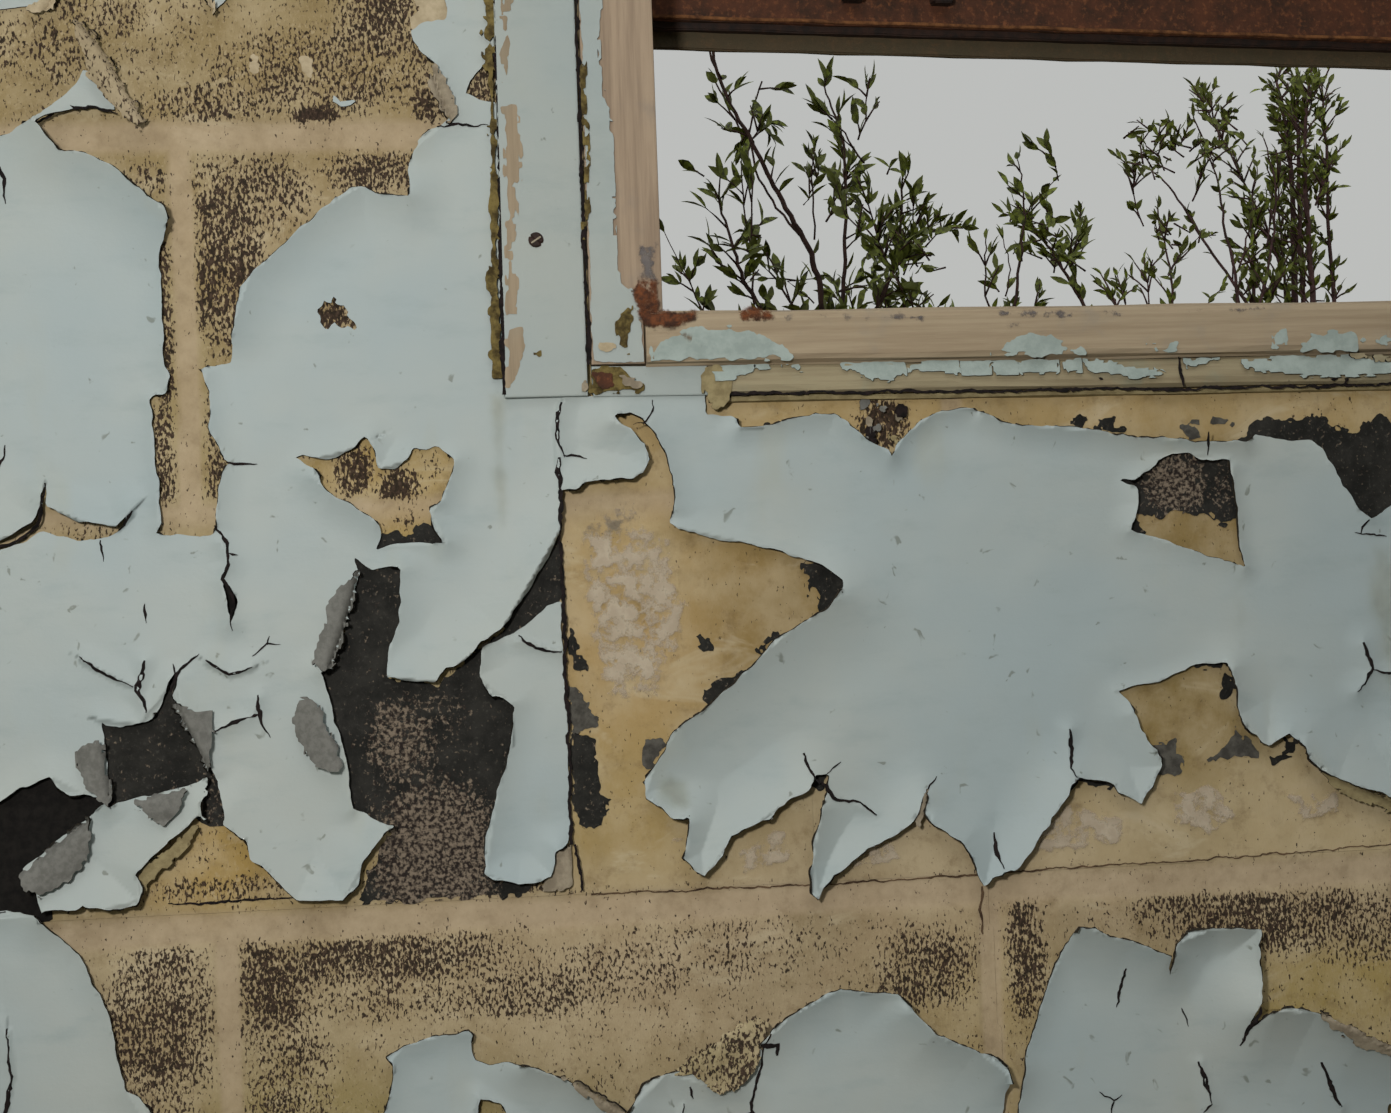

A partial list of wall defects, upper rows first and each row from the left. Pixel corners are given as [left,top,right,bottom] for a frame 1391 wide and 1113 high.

peeling [0,0,496,550]
corrosion [633,281,695,327]
corrosion [740,306,772,321]
crack [79,525,280,738]
peeling [0,306,1391,1113]
crack [518,400,1391,934]
crack [3,1028,13,1113]
crack [749,1034,780,1113]